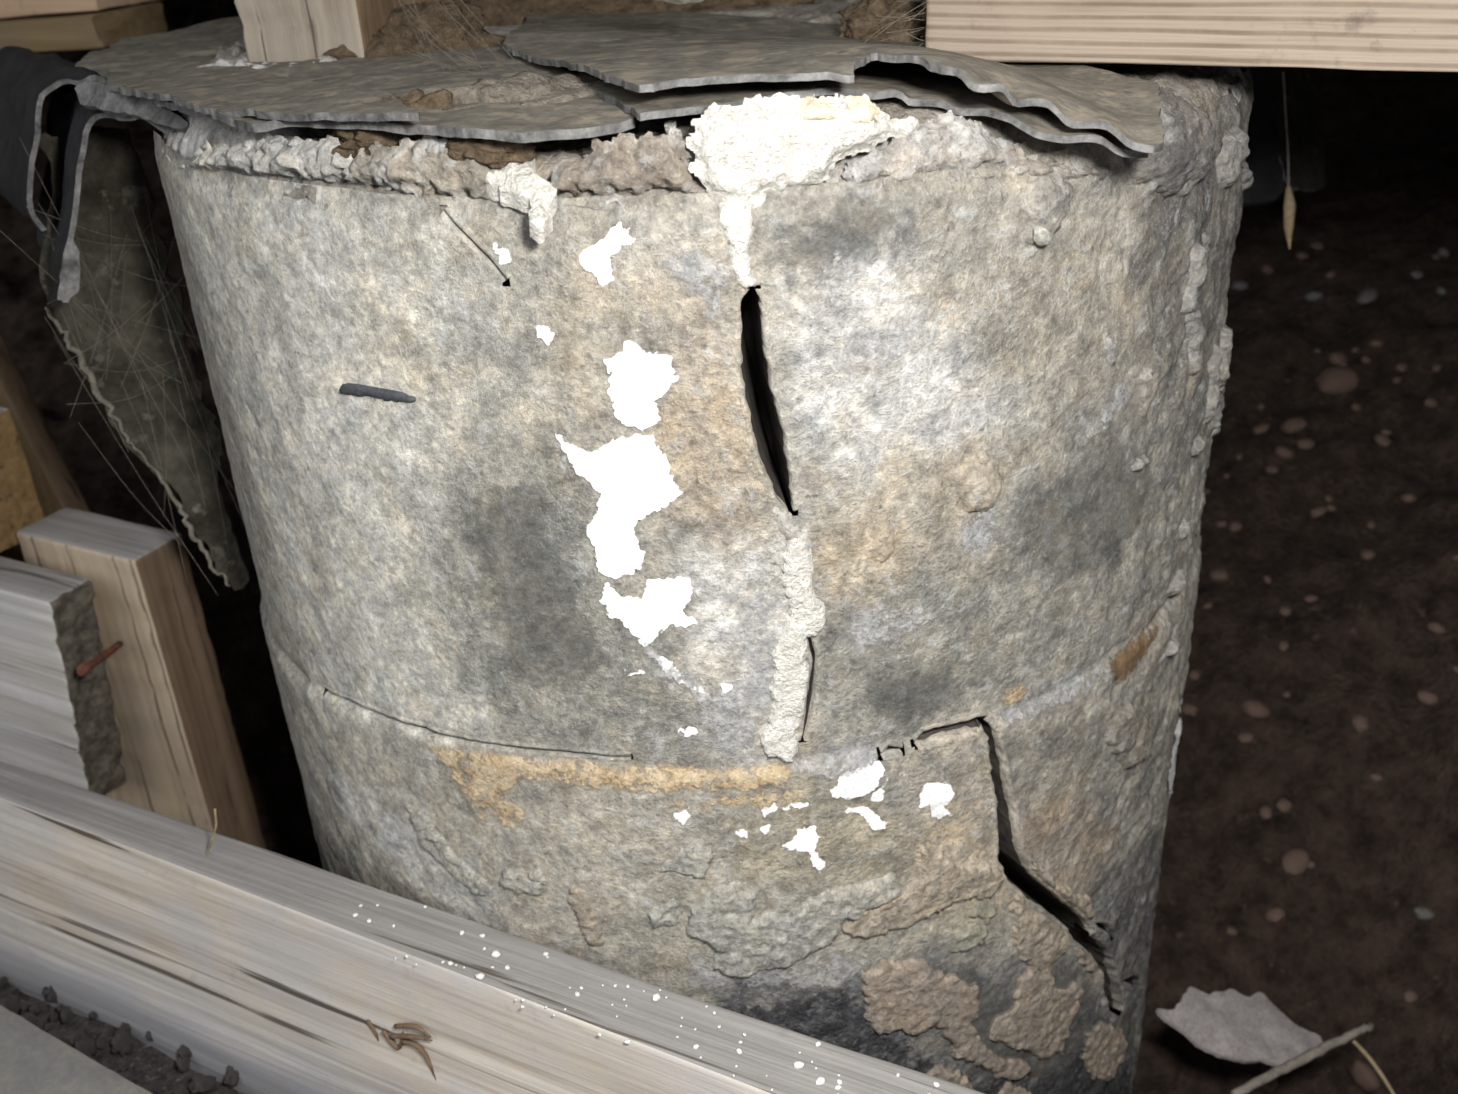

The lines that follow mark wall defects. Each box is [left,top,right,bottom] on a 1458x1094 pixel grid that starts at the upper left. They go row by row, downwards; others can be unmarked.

spalling [180,92,1110,247]
crack [733,287,800,515]
peeling [555,340,733,697]
crack [796,636,823,742]
corrosion [431,747,803,829]
peeling [782,825,825,873]
peeling [830,760,888,830]
peeling [919,782,955,819]
crack [877,711,1144,1094]
damp [688,952,934,1074]
spalling [647,846,1128,1094]
damp [961,962,1135,1094]